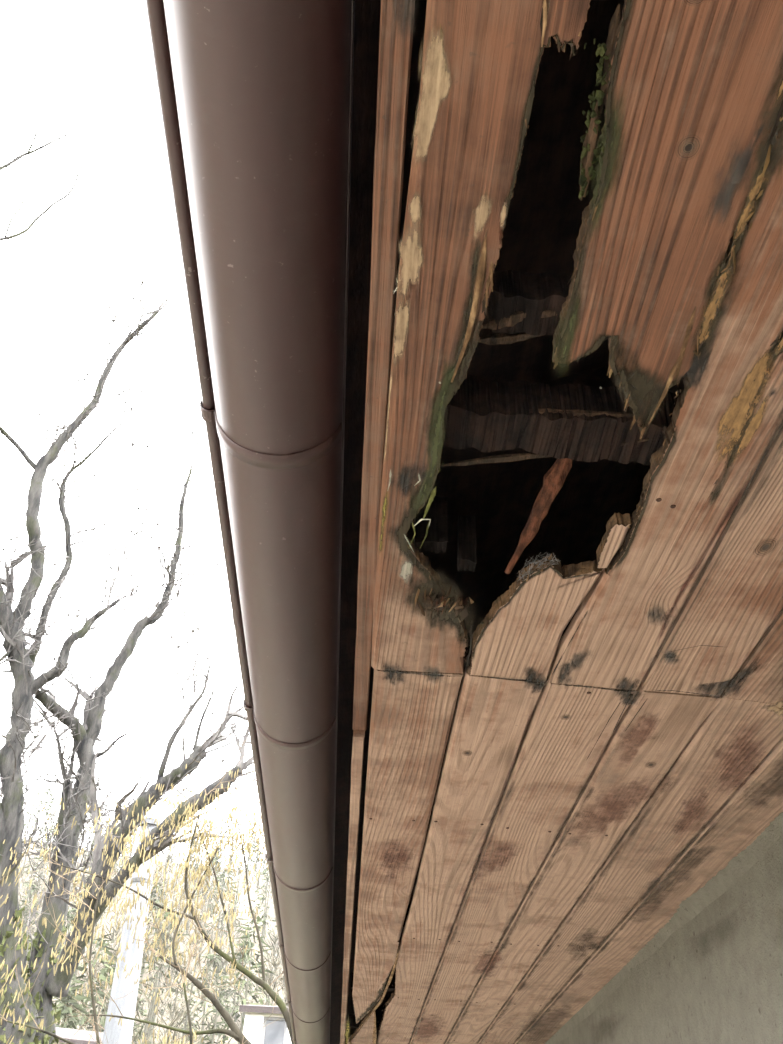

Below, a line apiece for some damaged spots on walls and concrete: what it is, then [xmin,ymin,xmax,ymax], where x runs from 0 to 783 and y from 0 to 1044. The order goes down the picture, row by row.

peeling [414,24,450,158]
peeling [393,195,423,360]
leakage [398,465,426,495]
leakage [400,562,474,630]
peeling [415,568,474,621]
leakage [570,933,597,955]